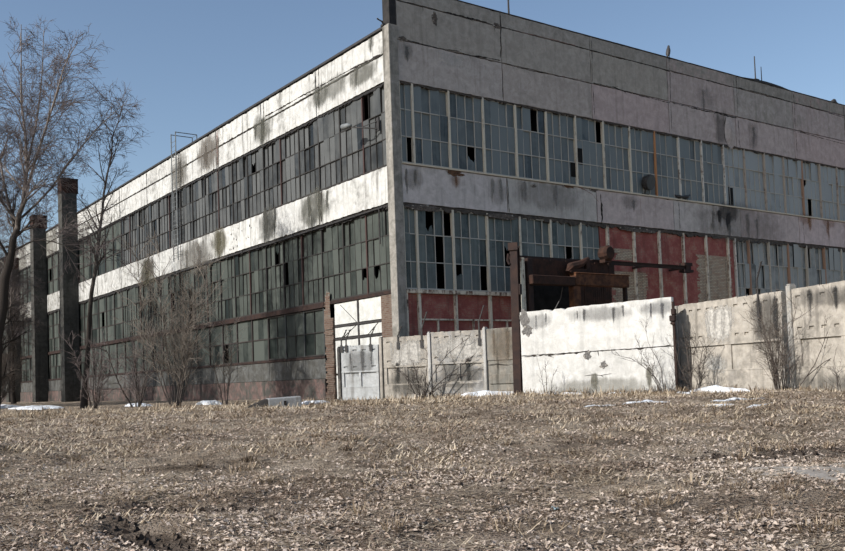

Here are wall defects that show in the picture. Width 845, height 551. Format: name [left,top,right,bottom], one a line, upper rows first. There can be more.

leakage [314,61,372,107]
leakage [198,135,219,169]
leakage [173,159,187,189]
leakage [259,206,276,242]
leakage [301,188,328,227]